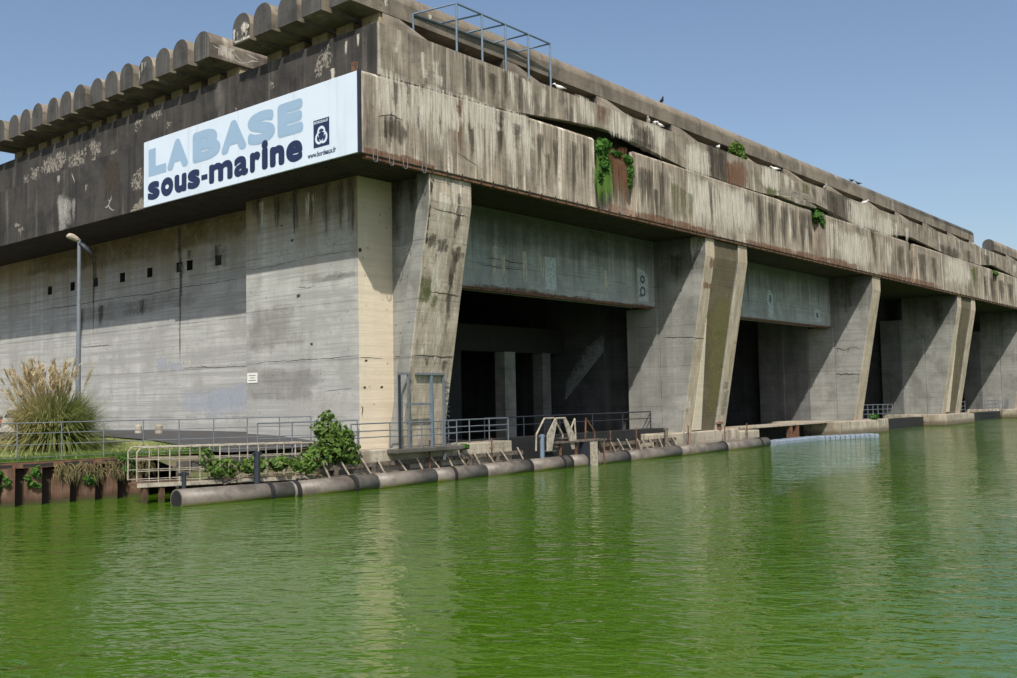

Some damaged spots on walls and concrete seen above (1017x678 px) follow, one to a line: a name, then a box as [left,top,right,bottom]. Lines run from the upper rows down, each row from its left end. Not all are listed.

water stain [378,52,558,175]
water stain [575,96,594,126]
water stain [572,142,613,199]
water stain [609,110,665,156]
water stain [639,144,812,247]
water stain [824,189,1017,300]
water stain [707,331,727,413]